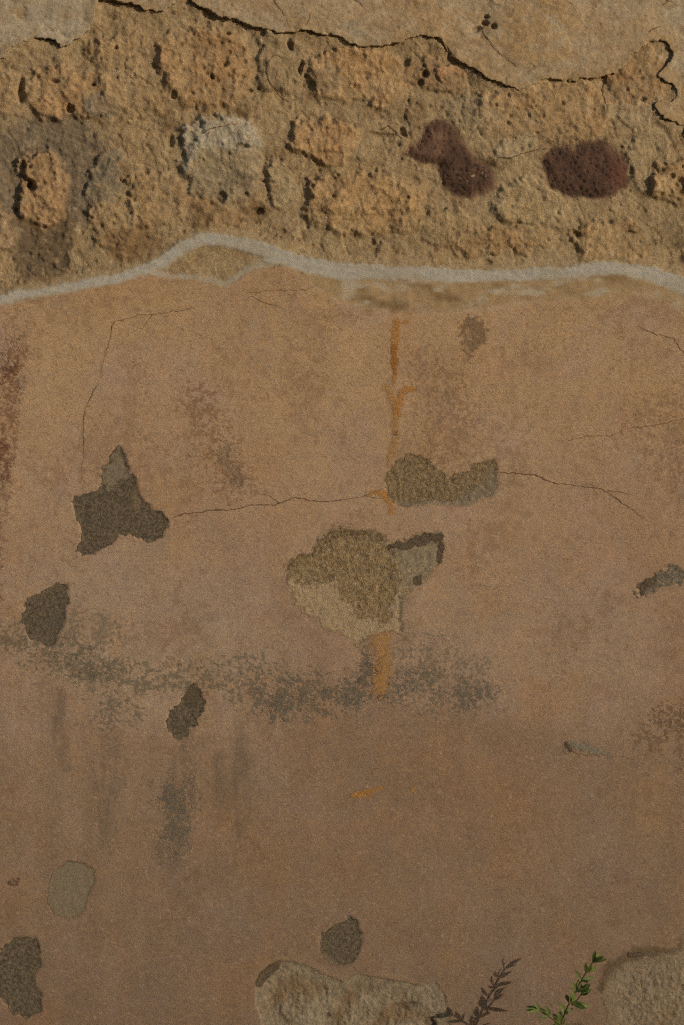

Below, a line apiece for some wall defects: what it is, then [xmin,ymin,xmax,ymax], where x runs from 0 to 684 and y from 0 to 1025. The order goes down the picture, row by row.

flaking render [0,0,684,295]
spalling [370,385,498,514]
spalling [72,445,169,556]
crack [174,487,386,518]
crack [501,472,652,523]
spalling [21,582,71,646]
spalling [287,524,445,700]
spalling [166,684,206,740]
spalling [321,915,363,966]
spalling [0,936,42,1020]
spalling [256,960,281,987]